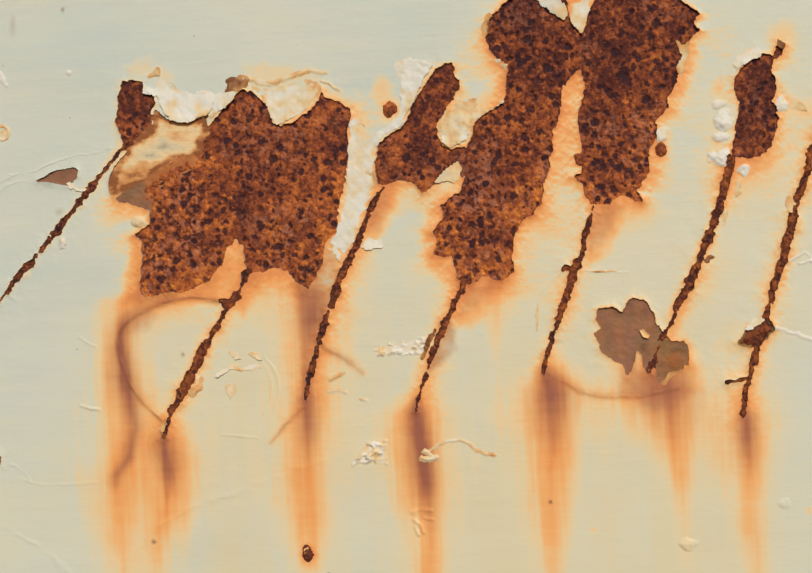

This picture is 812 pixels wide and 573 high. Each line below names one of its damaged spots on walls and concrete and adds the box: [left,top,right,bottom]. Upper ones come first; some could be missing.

peeling [37,167,86,192]
corrosion [32,46,398,573]
corrosion [220,289,812,573]
corrosion [365,0,812,379]
spalling [584,288,689,394]